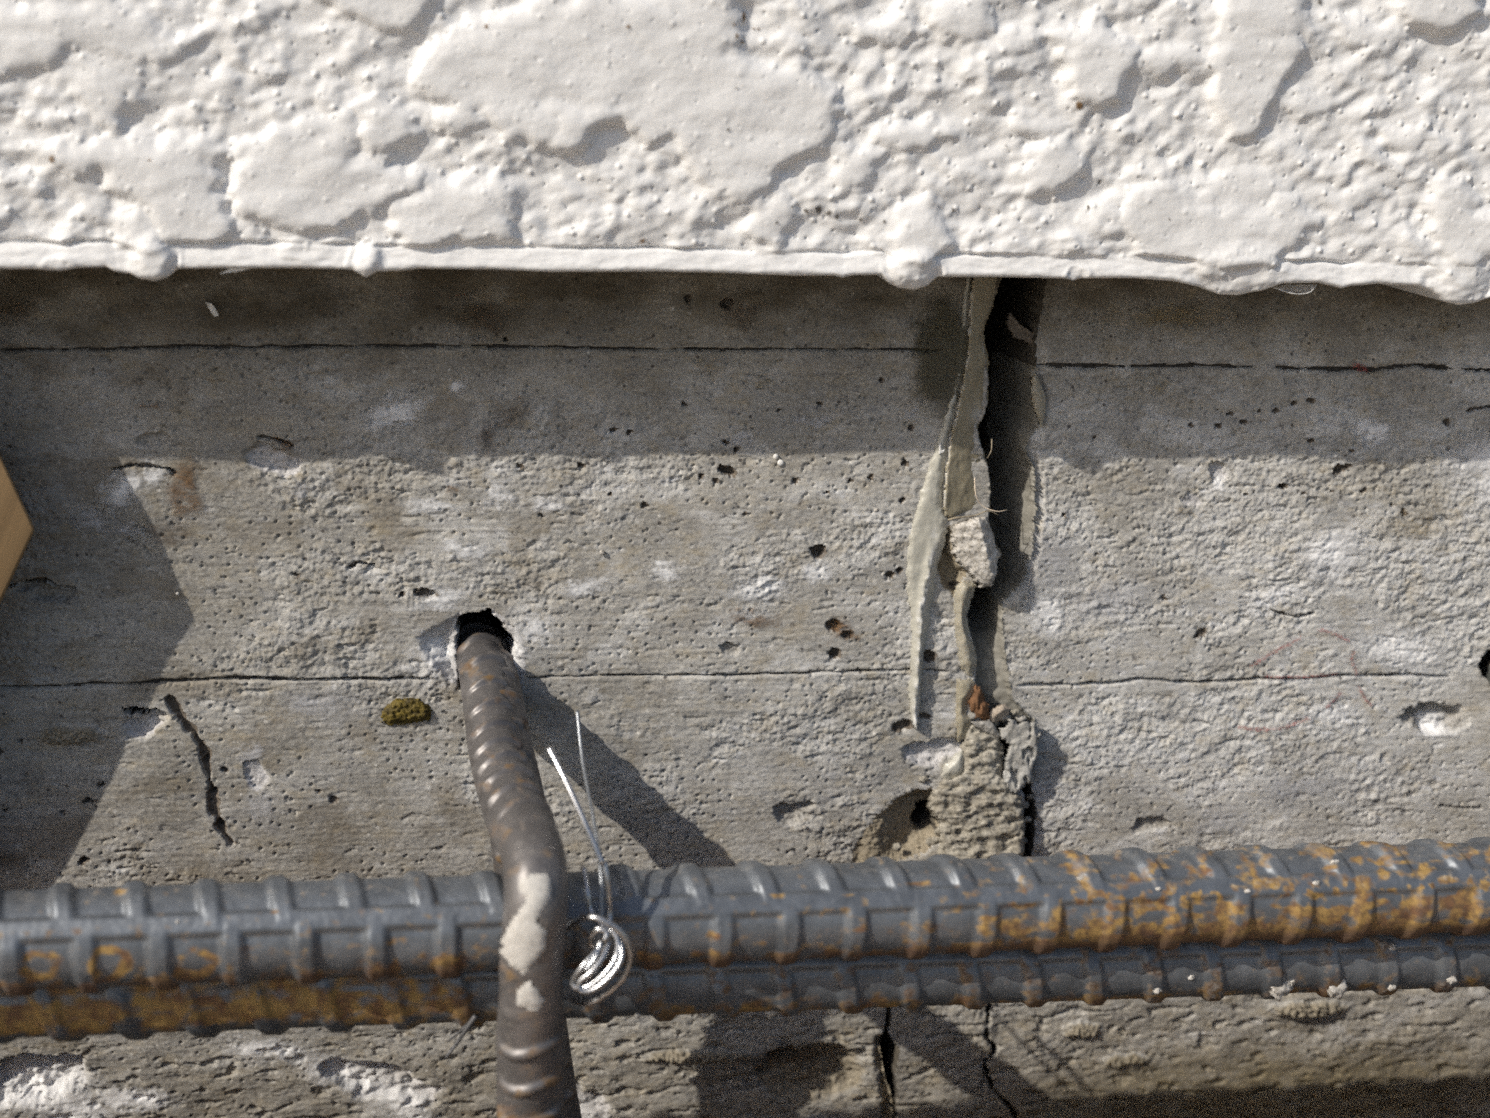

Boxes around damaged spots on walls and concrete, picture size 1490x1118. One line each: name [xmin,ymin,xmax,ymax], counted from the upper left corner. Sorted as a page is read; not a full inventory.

crack [937,277,1048,857]
spalling [417,611,462,684]
spalling [117,705,171,741]
crack [165,694,236,844]
spalling [242,757,272,793]
spalling [563,701,1490,1024]
spalling [0,870,504,1096]
spalling [319,1055,452,1112]
spalling [575,1076,618,1118]
spalling [748,1039,875,1111]
crack [874,1007,901,1118]
crack [933,1003,1019,1118]